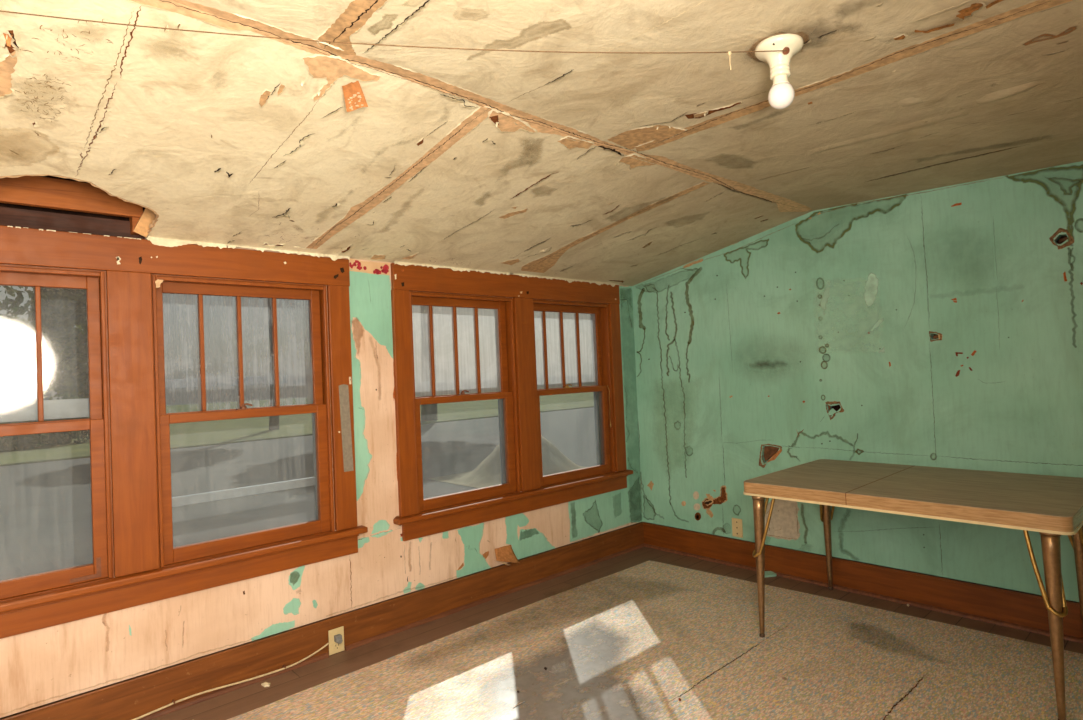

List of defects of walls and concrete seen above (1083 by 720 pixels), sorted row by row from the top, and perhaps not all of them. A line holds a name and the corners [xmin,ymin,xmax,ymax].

peeling [0,29,24,99]
crack [15,6,141,177]
peeling [416,79,771,170]
spalling [0,203,129,221]
damp [795,194,907,253]
damp [1006,165,1083,255]
hole [1049,228,1074,250]
damp [637,271,699,517]
hole [825,401,844,420]
spalling [759,444,782,468]
spalling [696,485,728,519]